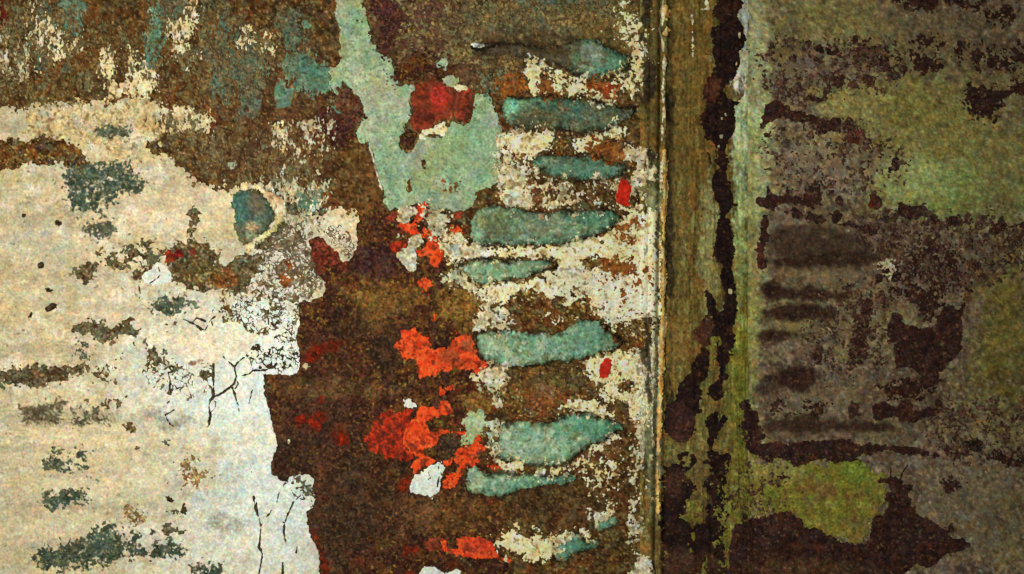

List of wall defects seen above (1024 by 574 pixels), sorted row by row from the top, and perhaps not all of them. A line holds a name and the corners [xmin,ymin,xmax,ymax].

peeling [436,43,507,97]
peeling [142,262,173,286]
damp [765,252,890,268]
crack [142,221,356,428]
damp [758,282,852,342]
peeling [591,358,612,386]
damp [778,366,816,392]
rust [295,413,325,427]
rust [425,413,466,461]
damp [764,416,893,434]
rust [283,470,322,508]
peeling [563,454,616,497]